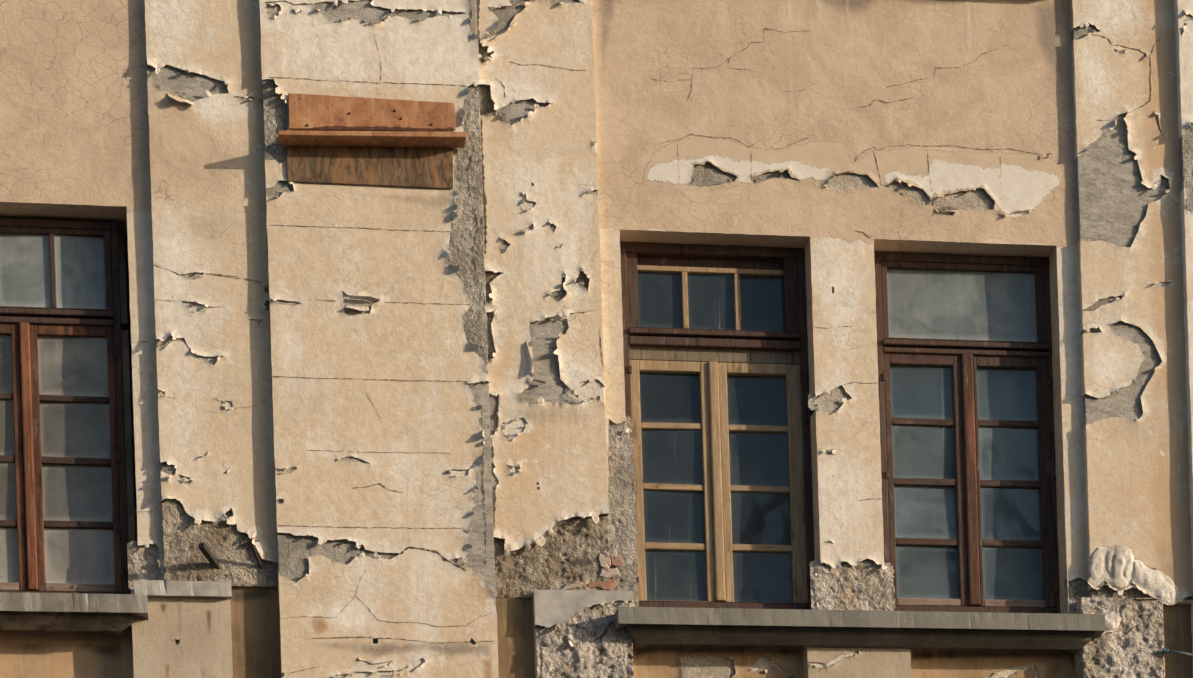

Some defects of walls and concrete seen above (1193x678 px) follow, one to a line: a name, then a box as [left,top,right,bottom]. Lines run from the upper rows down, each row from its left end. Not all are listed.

flaking render [147,65,288,164]
crack [653,28,811,98]
crack [660,134,808,180]
peeling [644,112,1193,247]
crack [858,45,1007,108]
crack [854,144,1039,206]
flaking render [442,83,639,678]
flaking render [1081,321,1162,427]
peeling [160,462,194,484]
flaking render [127,495,400,590]
flaking render [810,558,895,611]
flaking render [1064,578,1165,678]